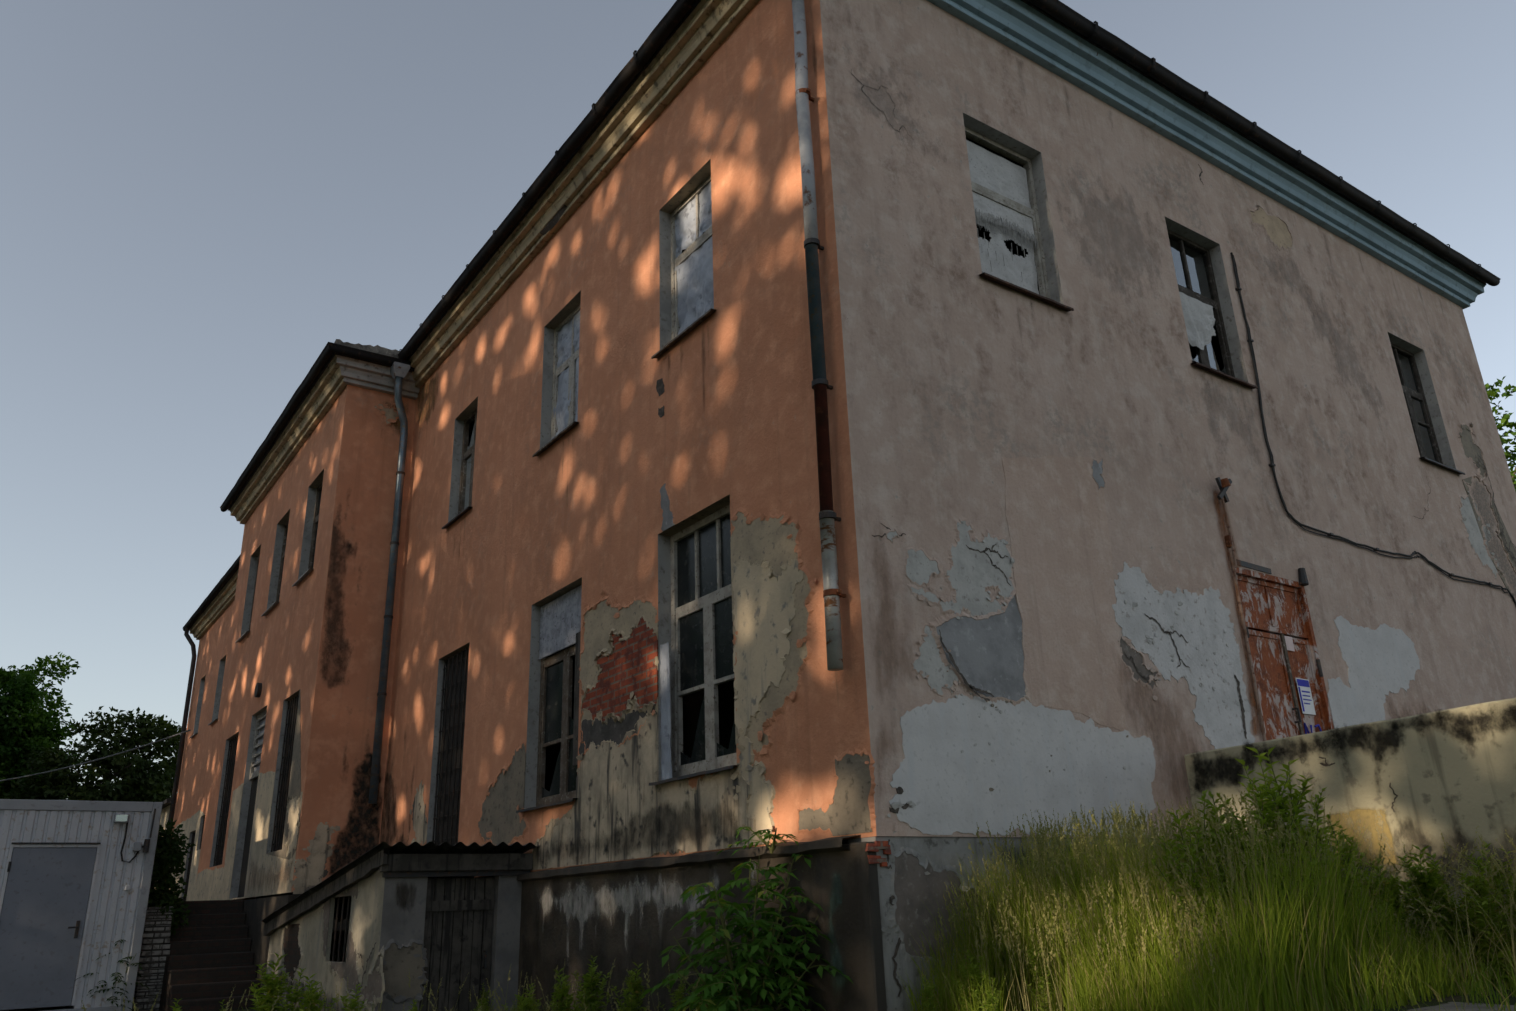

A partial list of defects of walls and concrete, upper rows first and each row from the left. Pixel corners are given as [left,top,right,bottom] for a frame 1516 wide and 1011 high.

crack [851,69,912,138]
flaking render [1457,421,1516,607]
leakage [323,525,350,687]
leakage [329,754,410,875]
flaking render [576,590,659,772]
flaking render [730,507,816,789]
peeling [911,516,1016,705]
flaking render [1118,633,1174,701]
leakage [1194,706,1516,792]